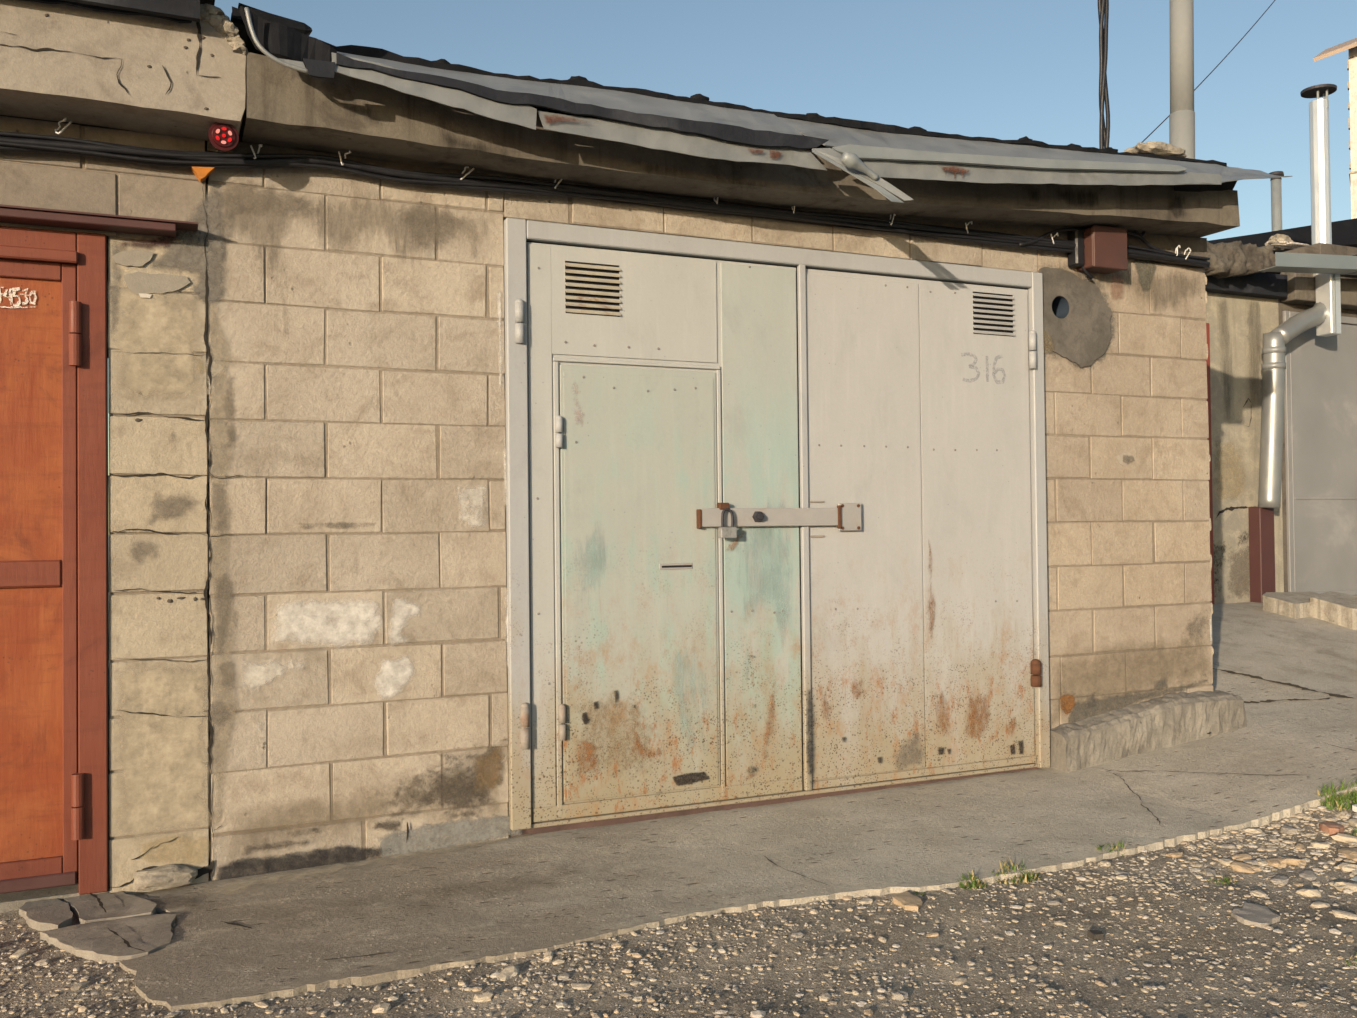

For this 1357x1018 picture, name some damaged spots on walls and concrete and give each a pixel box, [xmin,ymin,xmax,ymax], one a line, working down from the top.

crack [0,32,128,93]
crack [162,22,215,95]
crack [107,184,242,879]
damp [276,600,419,645]
damp [376,658,412,697]
crack [1213,668,1356,703]
corrosion [577,691,661,770]
corrosion [969,697,988,737]
corrosion [1007,719,1023,754]
damp [397,750,495,816]
corrosion [673,772,709,785]
damp [375,814,400,831]